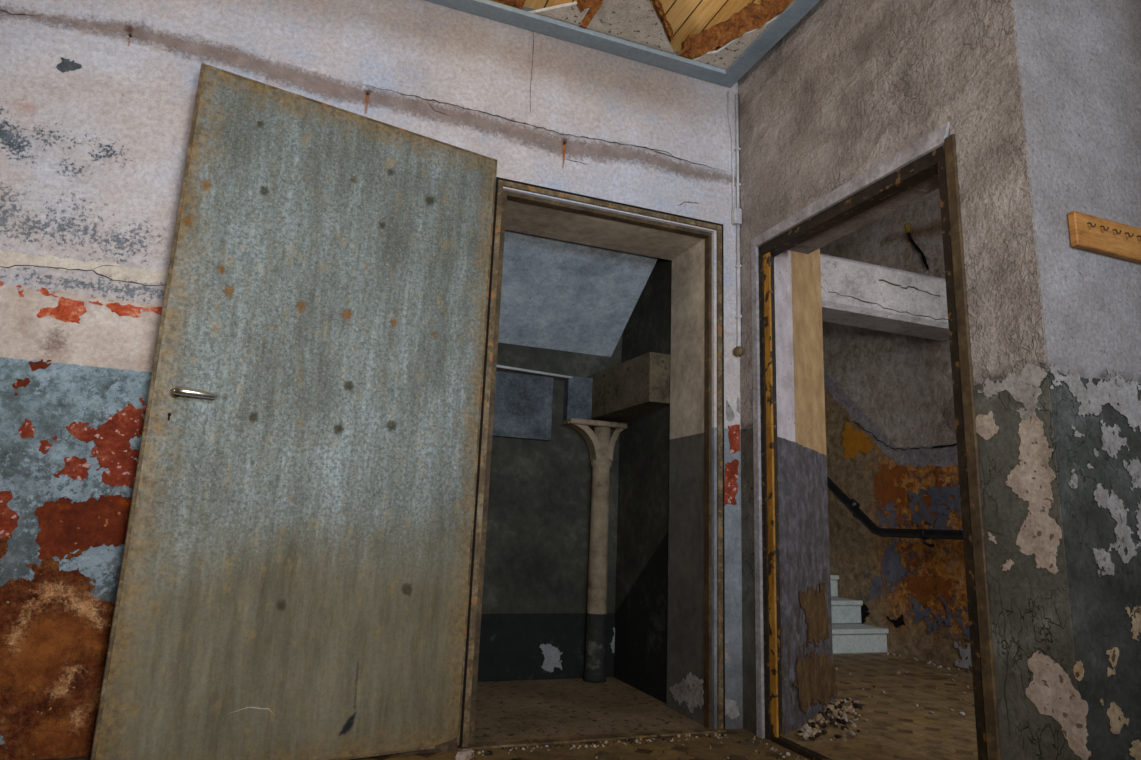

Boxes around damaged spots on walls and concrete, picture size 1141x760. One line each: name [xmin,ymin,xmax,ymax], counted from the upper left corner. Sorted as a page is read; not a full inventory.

crack [350,32,727,172]
crack [0,265,160,286]
peeling [0,249,168,323]
crack [828,224,948,320]
peeling [724,397,740,506]
peeling [976,363,1141,577]
peeling [0,398,146,760]
peeling [539,644,563,673]
peeling [670,672,704,713]
peeling [861,481,961,623]
peeling [1025,647,1129,760]
peeling [1125,606,1141,641]